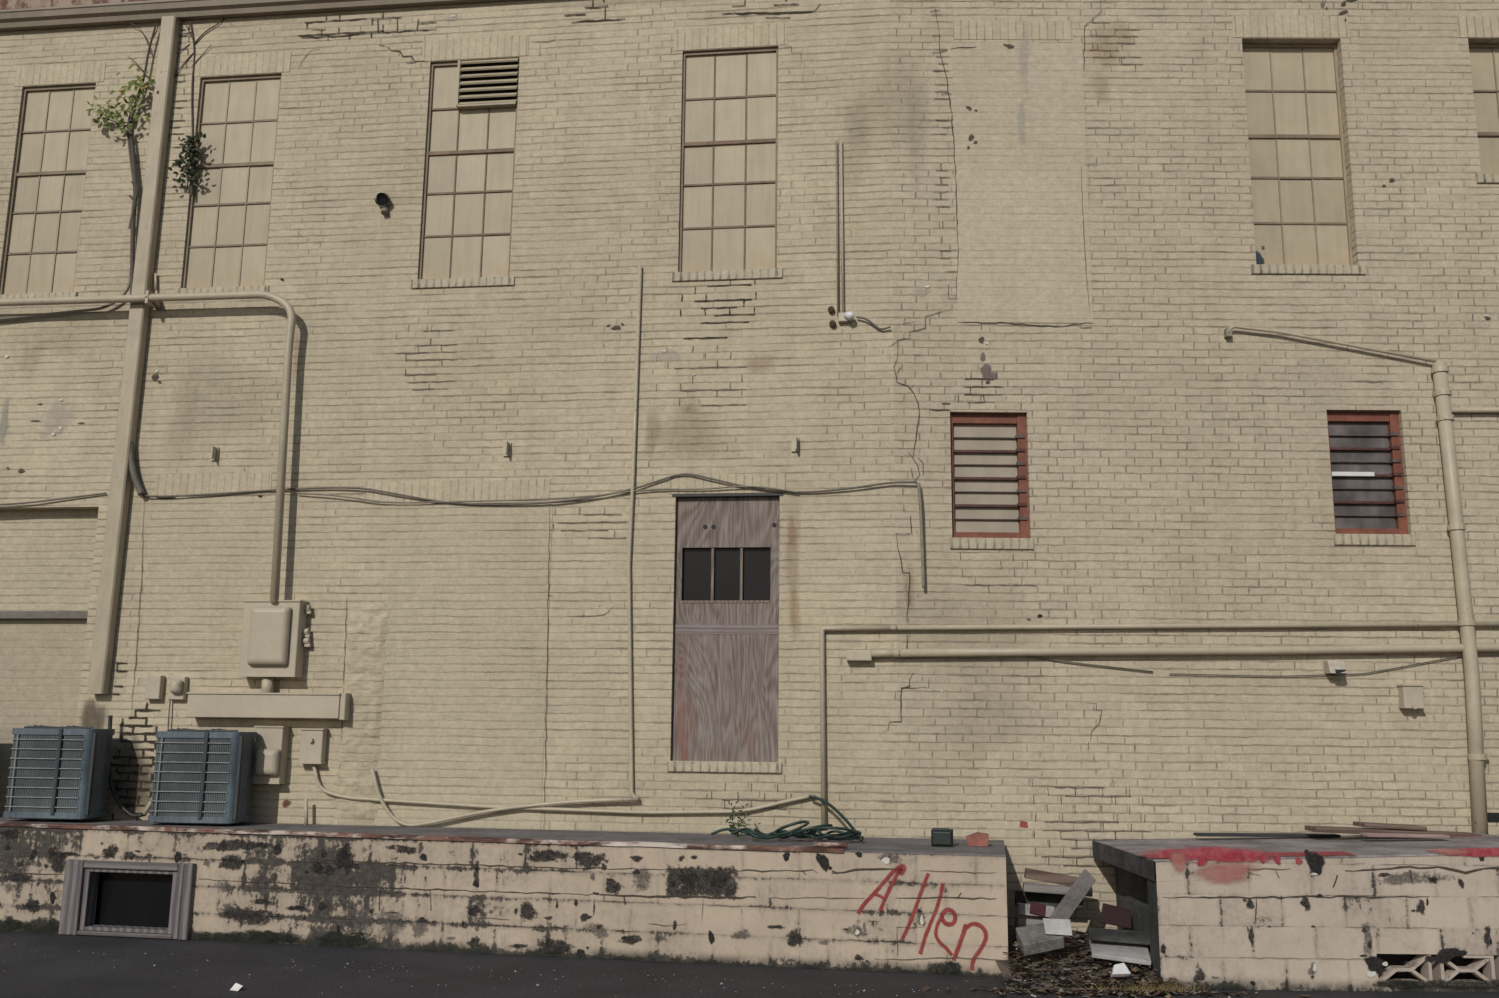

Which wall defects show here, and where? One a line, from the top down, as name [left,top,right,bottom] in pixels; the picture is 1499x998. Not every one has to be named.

spalling [298,11,384,40]
crack [882,10,1093,731]
spalling [111,702,160,820]
water stain [0,917,60,934]
water stain [190,930,296,944]
water stain [317,932,367,948]
water stain [928,961,961,975]